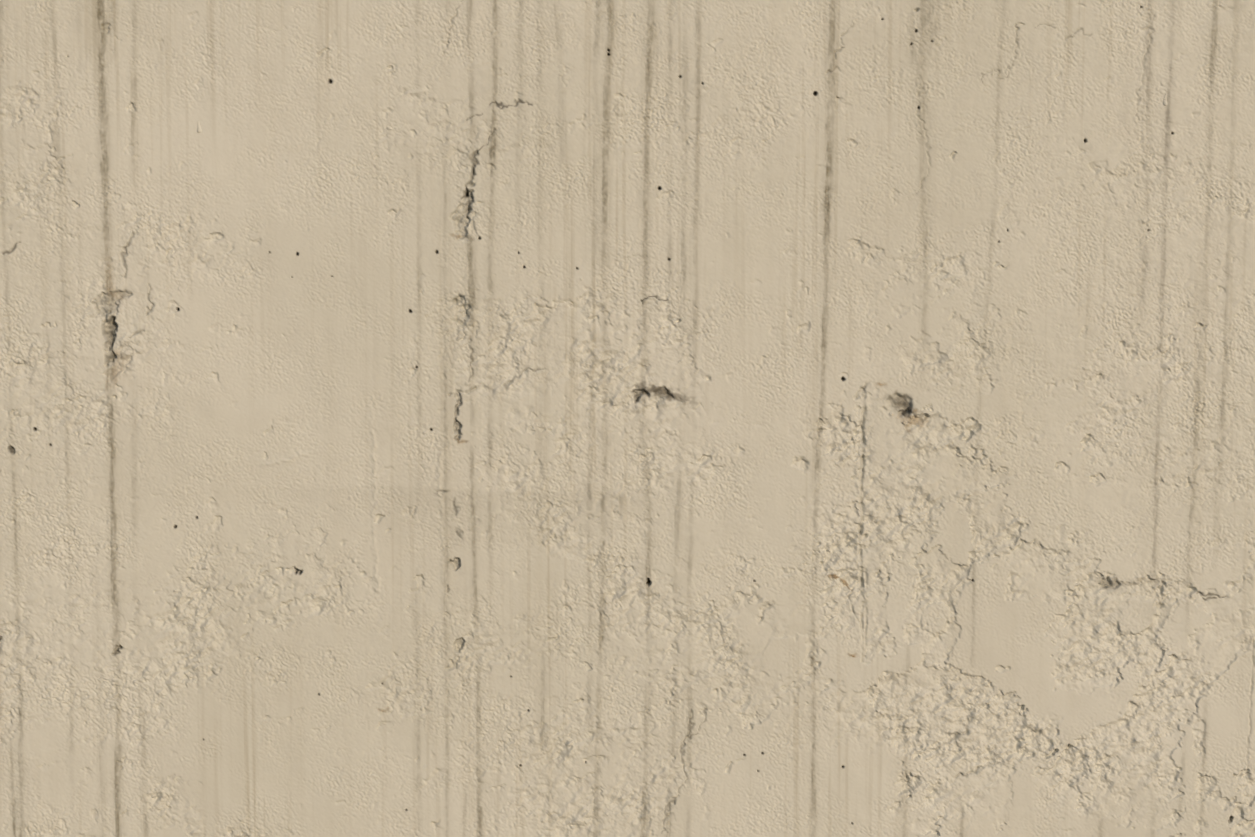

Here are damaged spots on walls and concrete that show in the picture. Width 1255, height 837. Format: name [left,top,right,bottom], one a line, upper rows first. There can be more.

peeling [462,278,733,505]
peeling [110,515,366,699]
crack [846,382,870,664]
spalling [595,388,1255,837]
peeling [484,725,696,837]